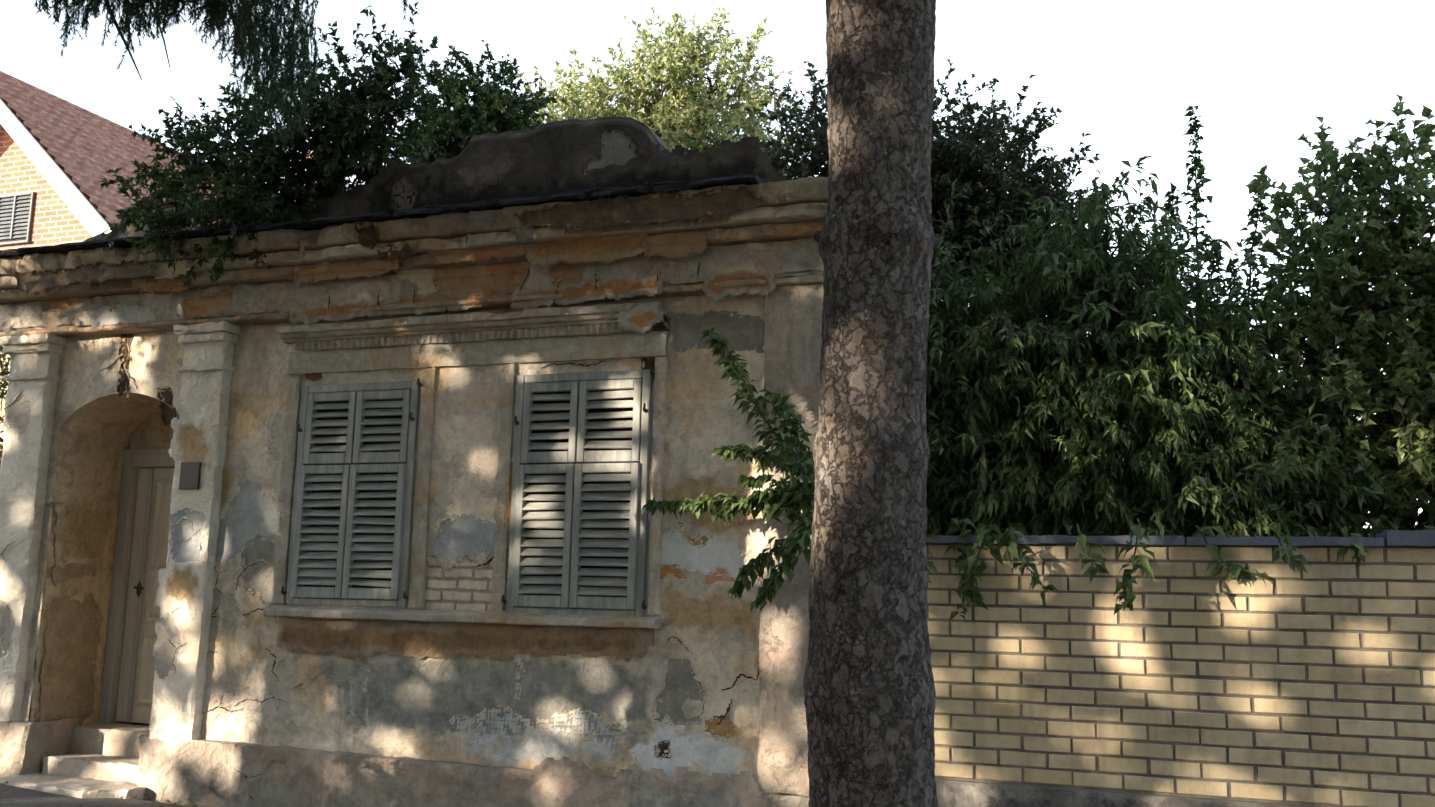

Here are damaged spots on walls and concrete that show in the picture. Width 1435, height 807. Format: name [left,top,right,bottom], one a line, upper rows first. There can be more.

peeling [169,480,289,641]
flaking render [411,514,510,611]
peeling [645,519,748,616]
crack [665,634,759,726]
leakage [935,781,1056,807]
leakage [1074,791,1273,807]